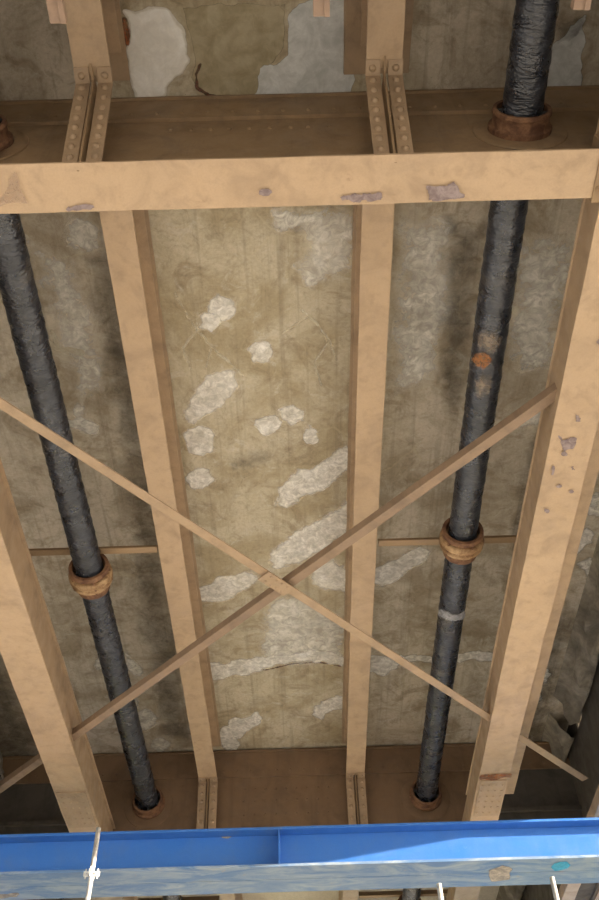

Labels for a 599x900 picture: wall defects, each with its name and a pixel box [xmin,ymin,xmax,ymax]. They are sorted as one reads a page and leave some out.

peeling [122,0,355,97]
peeling [547,15,586,86]
peeling [340,192,383,203]
peeling [426,182,465,201]
water stain [200,296,235,331]
water stain [184,371,237,455]
peeling [558,435,577,456]
water stain [279,448,348,507]
water stain [271,504,347,568]
water stain [199,572,257,601]
water stain [220,712,262,750]
peeling [489,866,512,882]